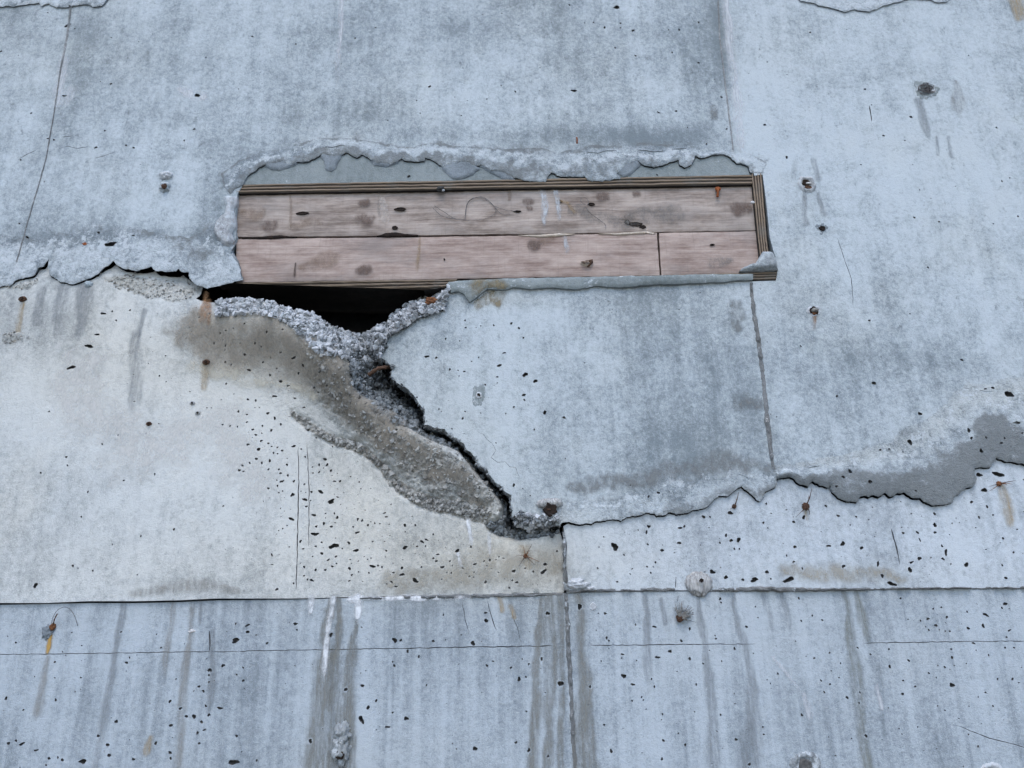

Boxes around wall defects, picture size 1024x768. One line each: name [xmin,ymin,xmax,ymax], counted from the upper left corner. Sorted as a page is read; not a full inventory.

peeling [213,138,767,247]
spalling [0,278,39,290]
spalling [99,272,203,303]
damp [176,310,481,506]
spalling [290,411,492,525]
crack [348,317,560,540]
spalling [513,509,561,534]
damp [306,536,560,768]
damp [529,592,595,768]